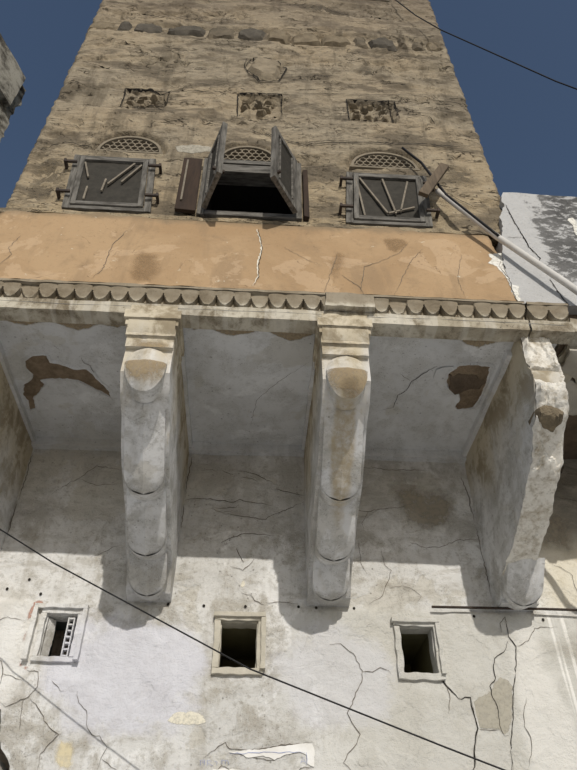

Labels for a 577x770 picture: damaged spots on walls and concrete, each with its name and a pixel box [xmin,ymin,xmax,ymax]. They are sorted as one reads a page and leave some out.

crack [253,229,263,284]
crack [311,241,420,294]
spalling [19,353,116,411]
spalling [434,362,495,411]
crack [181,458,303,570]
crack [410,479,491,594]
crack [0,660,116,770]
peeling [230,743,315,767]
crack [336,643,390,770]
crack [443,617,553,770]